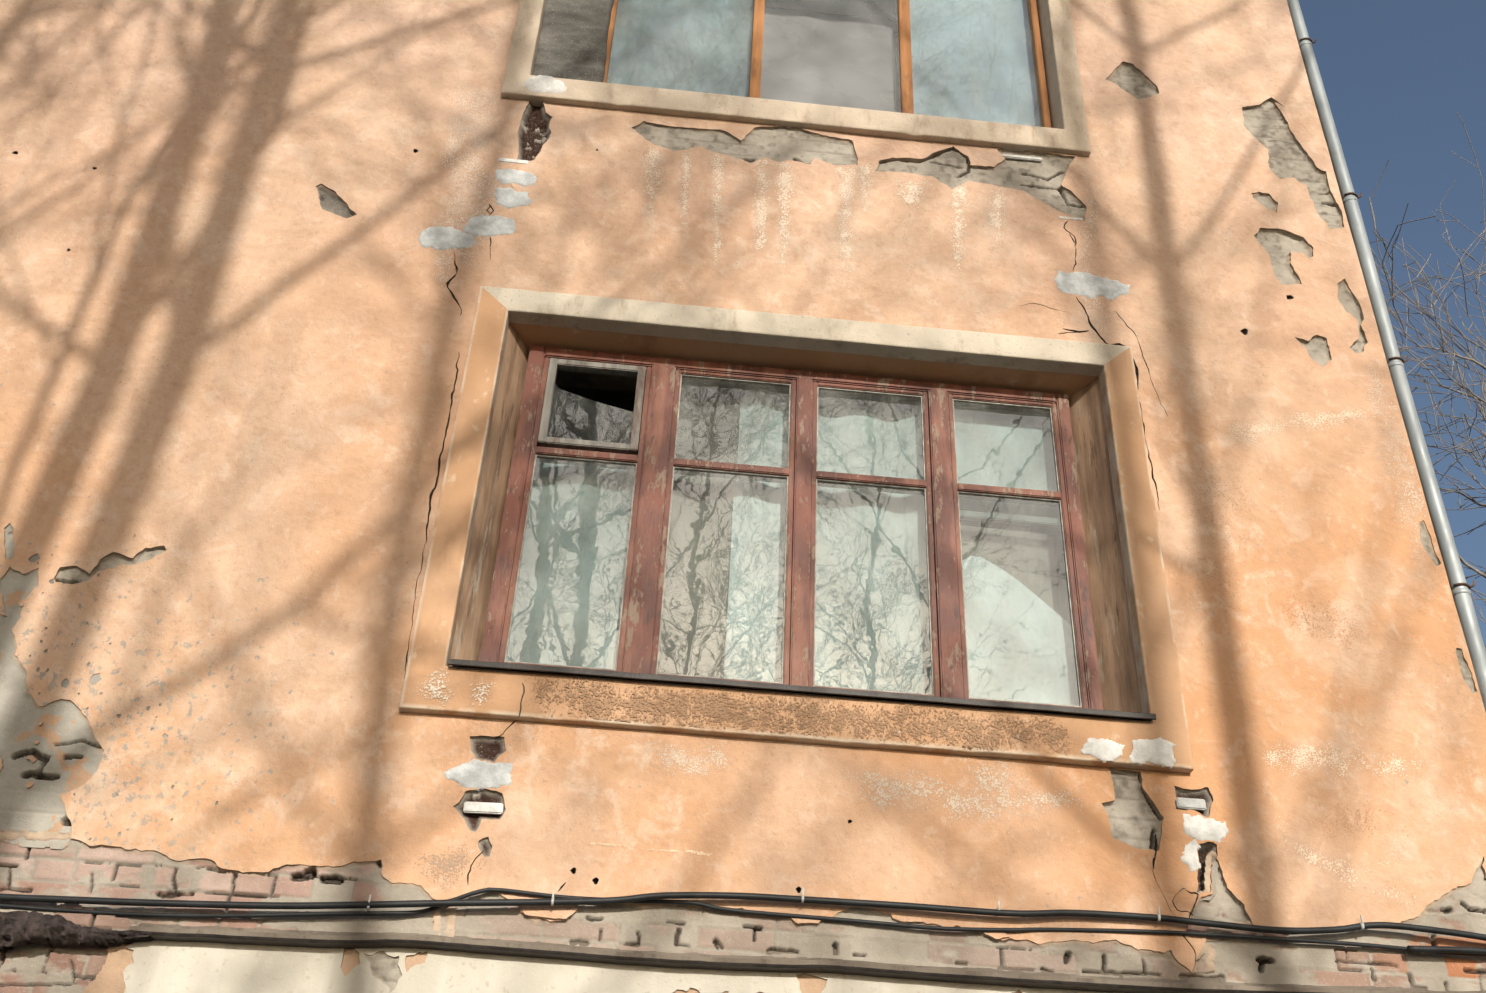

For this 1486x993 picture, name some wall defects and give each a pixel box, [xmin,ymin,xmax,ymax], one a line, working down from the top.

flaking render [0,521,1486,993]